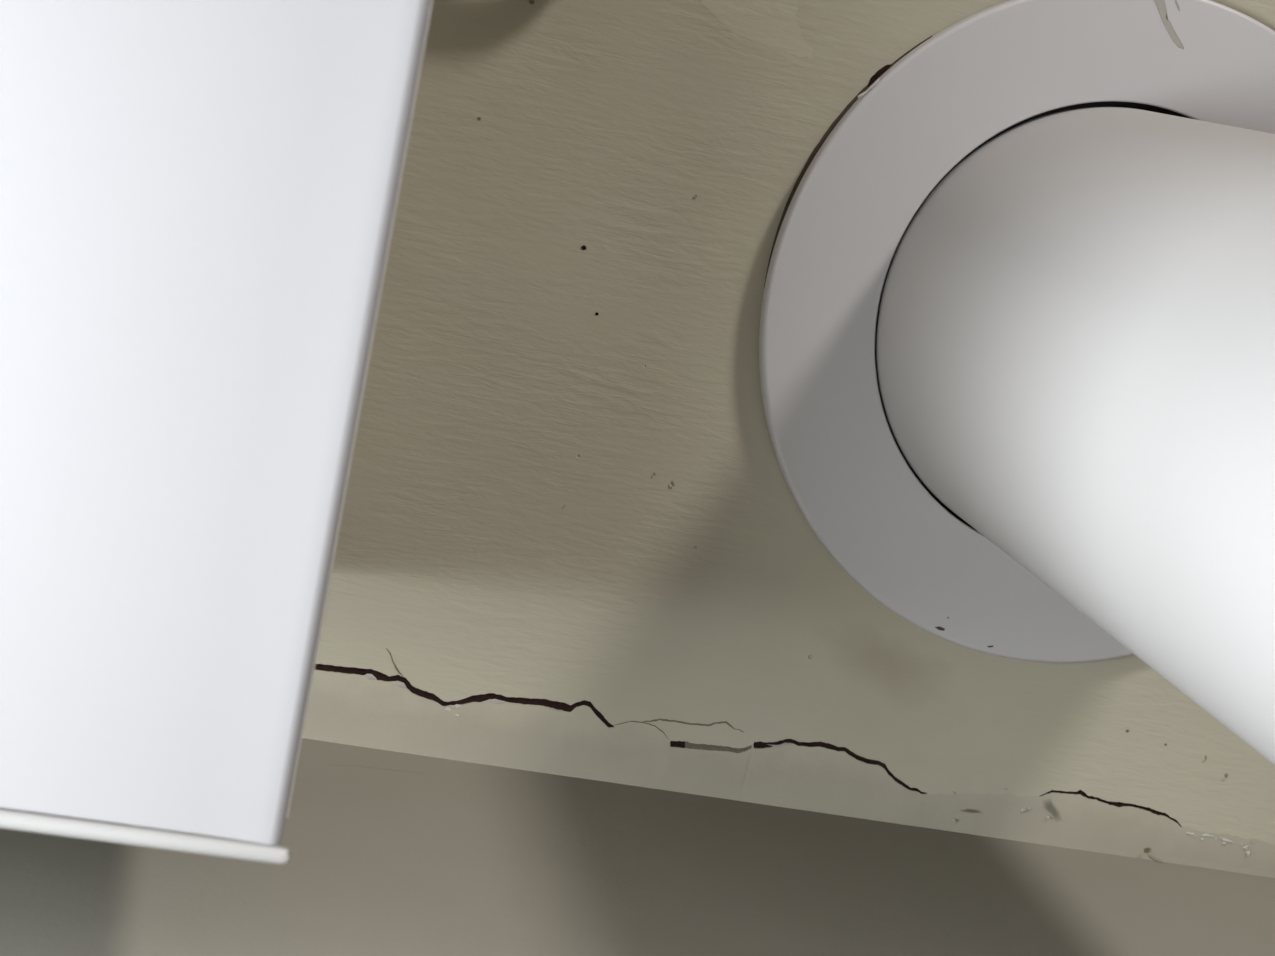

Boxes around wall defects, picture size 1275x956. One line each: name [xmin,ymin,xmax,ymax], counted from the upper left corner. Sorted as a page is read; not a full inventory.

crack [315,648,926,794]
crack [1040,790,1181,826]